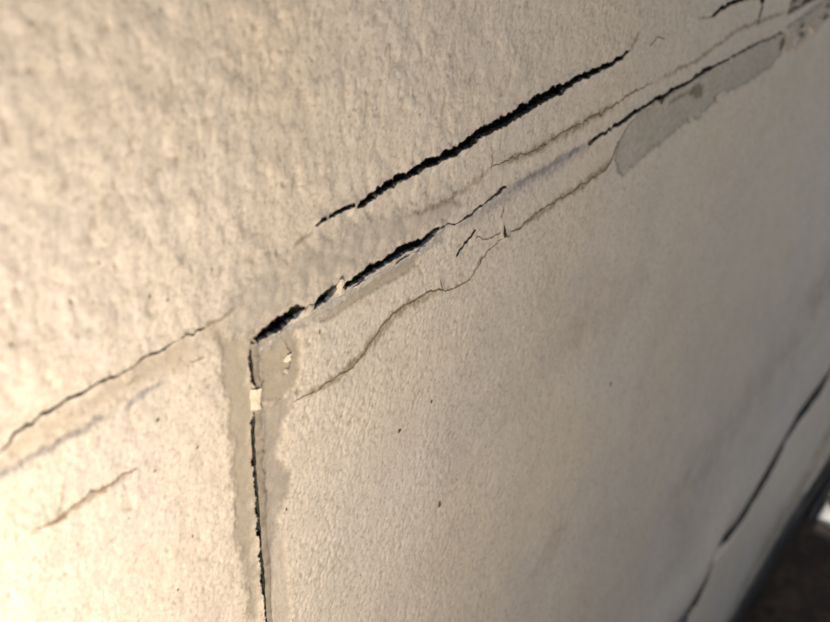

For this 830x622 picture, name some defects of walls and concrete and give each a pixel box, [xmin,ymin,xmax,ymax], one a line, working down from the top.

peeling [615,0,830,175]
crack [0,316,226,452]
peeling [220,330,300,554]
crack [247,0,786,622]